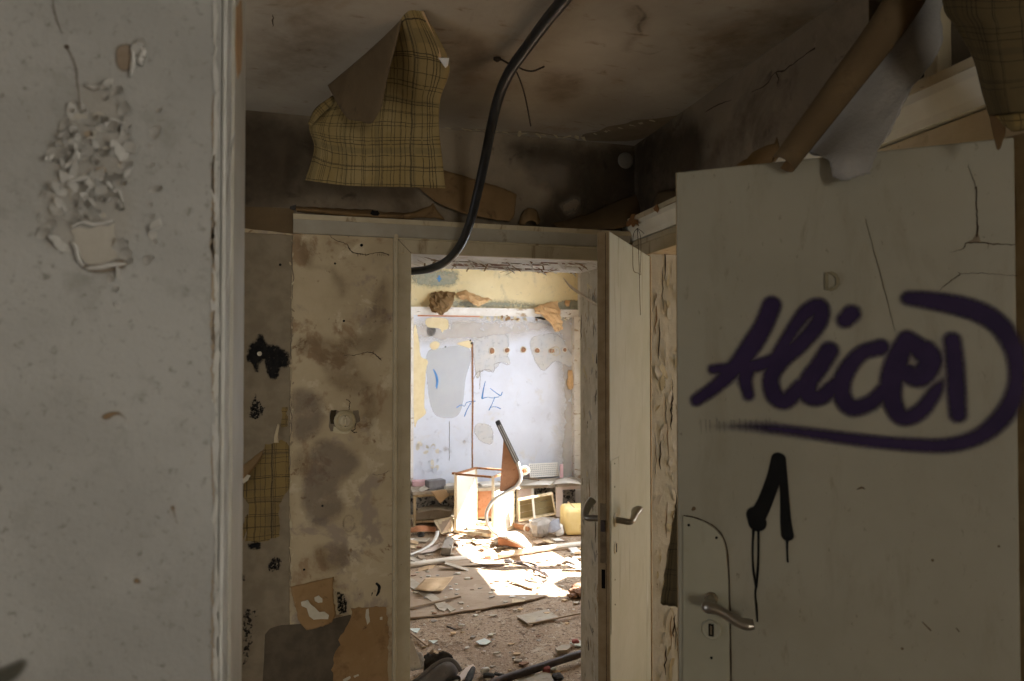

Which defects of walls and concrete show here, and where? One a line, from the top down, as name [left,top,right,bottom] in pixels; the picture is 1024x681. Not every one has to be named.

peeling [35,37,163,309]
crack [331,237,389,256]
crack [939,169,1017,291]
peeling [413,300,597,427]